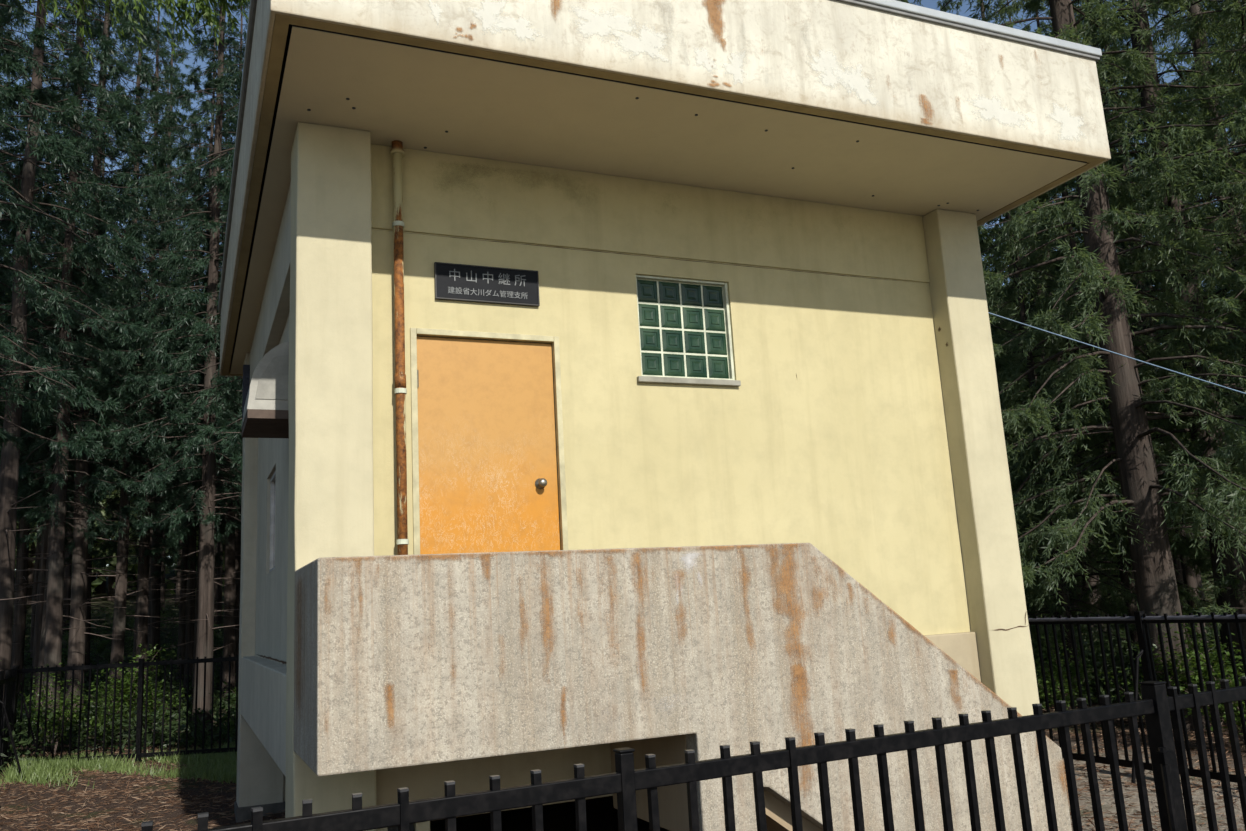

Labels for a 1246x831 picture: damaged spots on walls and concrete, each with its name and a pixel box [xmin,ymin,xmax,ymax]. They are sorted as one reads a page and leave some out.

peeling [469,0,538,43]
peeling [573,7,668,61]
corrosion [704,0,726,49]
peeling [809,50,876,104]
corrosion [921,95,932,124]
corrosion [394,553,490,578]
corrosion [584,547,682,600]
corrosion [542,572,553,651]
corrosion [701,543,815,746]